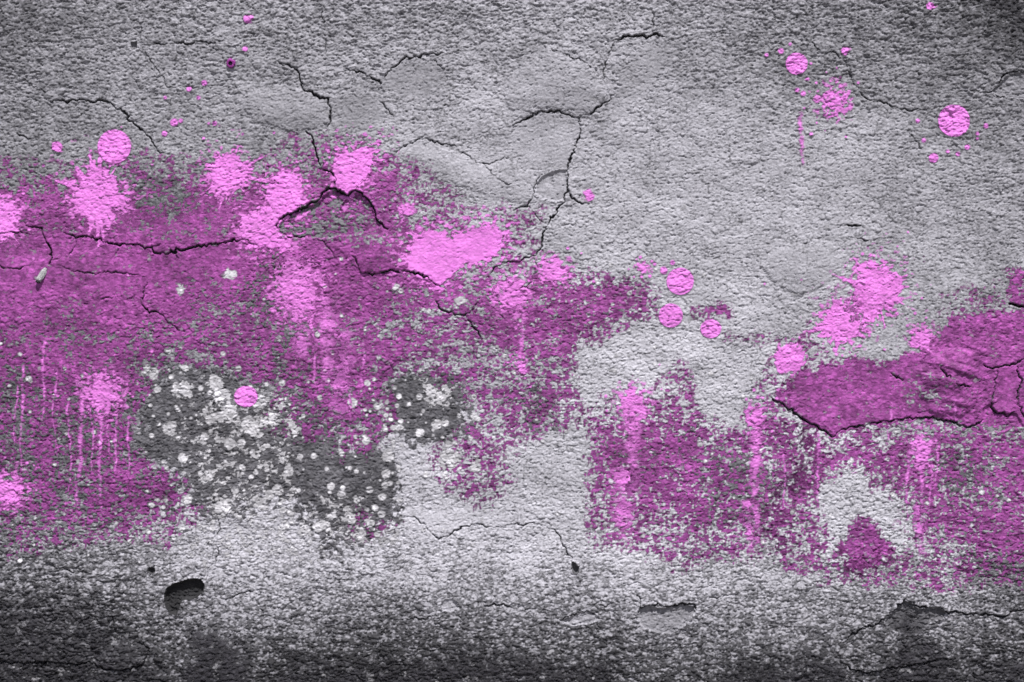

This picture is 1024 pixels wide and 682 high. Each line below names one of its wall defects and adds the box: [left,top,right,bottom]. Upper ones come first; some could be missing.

crack [61,93,155,146]
crack [276,63,387,242]
crack [353,53,439,115]
crack [491,18,664,288]
crack [13,226,240,328]
crack [355,258,481,337]
peeling [0,132,1024,638]
crack [772,359,1024,437]